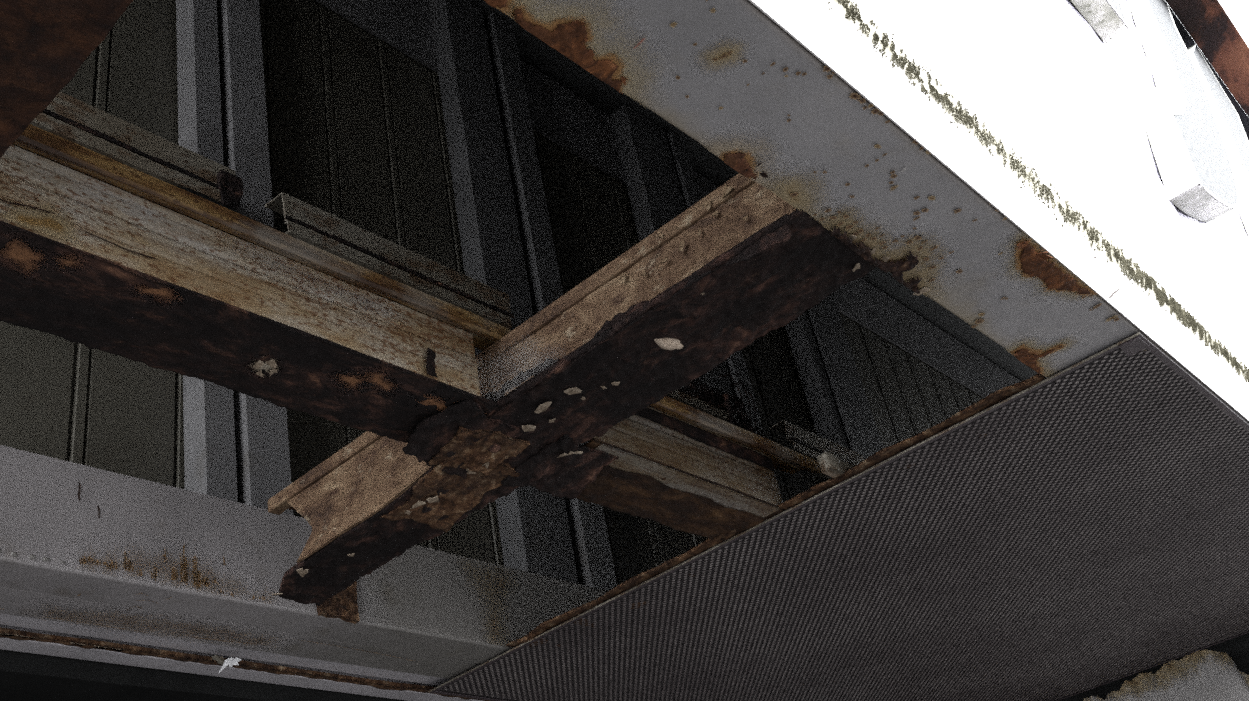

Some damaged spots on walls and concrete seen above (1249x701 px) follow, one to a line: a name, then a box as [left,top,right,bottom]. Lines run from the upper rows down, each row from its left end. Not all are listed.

corrosion [485,0,635,95]
corrosion [711,141,768,182]
damp [824,211,936,295]
corrosion [999,236,1119,322]
corrosion [1008,341,1069,377]
corrosion [80,545,233,596]